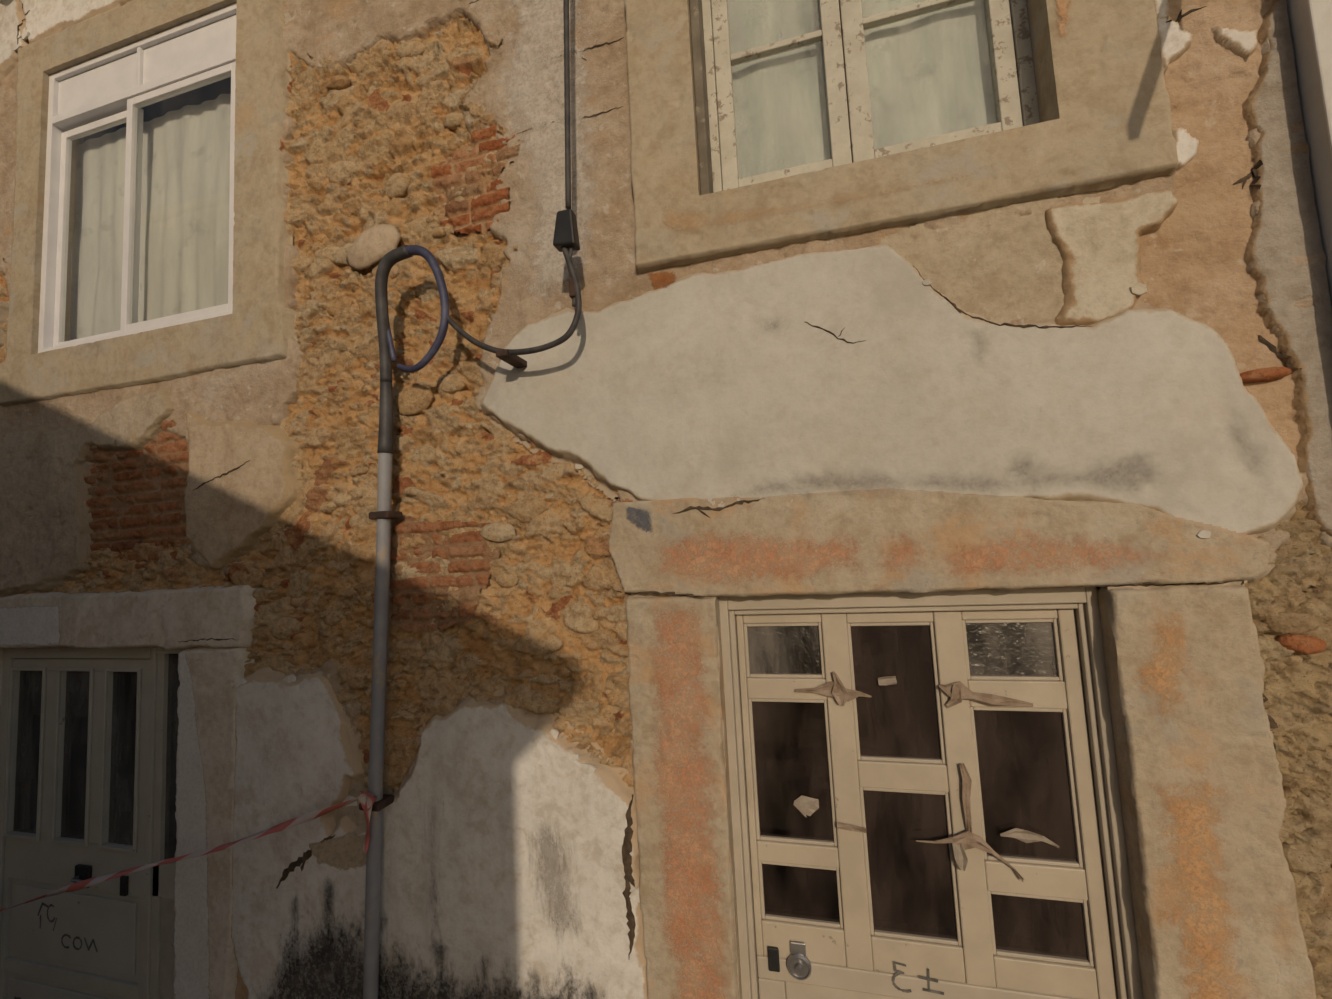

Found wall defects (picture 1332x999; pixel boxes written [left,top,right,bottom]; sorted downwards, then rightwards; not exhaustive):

spalling [879,0,1300,471]
crack [1233,160,1263,190]
crack [806,322,866,343]
spalling [0,0,648,999]
crack [672,498,764,518]
spalling [1242,501,1332,999]
leakage [269,885,593,999]
crack [622,794,636,957]